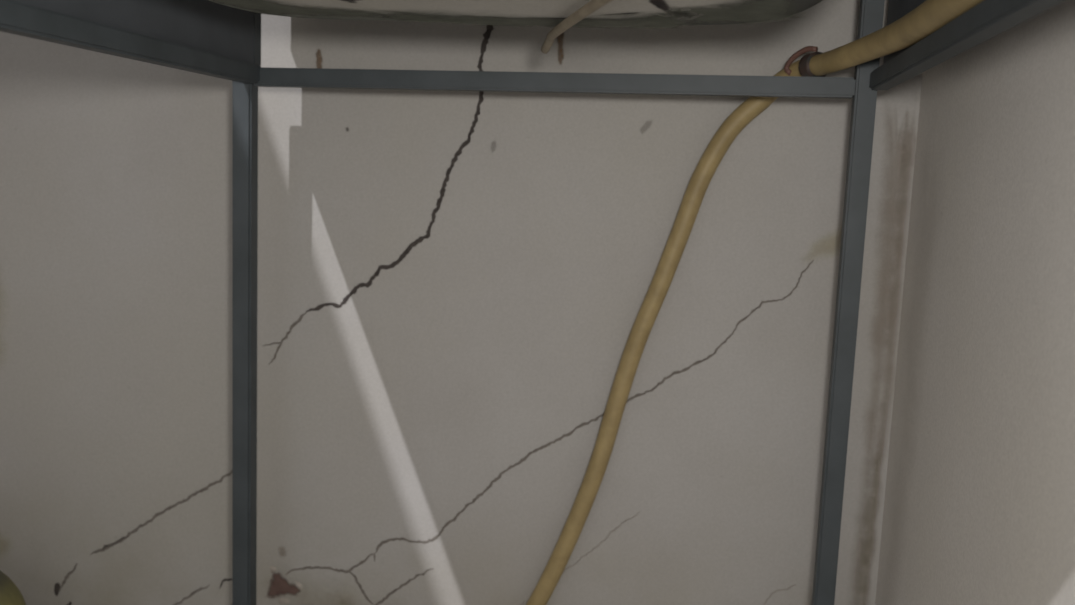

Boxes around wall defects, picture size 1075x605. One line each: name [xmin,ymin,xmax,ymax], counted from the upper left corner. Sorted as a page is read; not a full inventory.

crack [263,25,494,365]
crack [54,470,233,605]
crack [285,260,814,605]